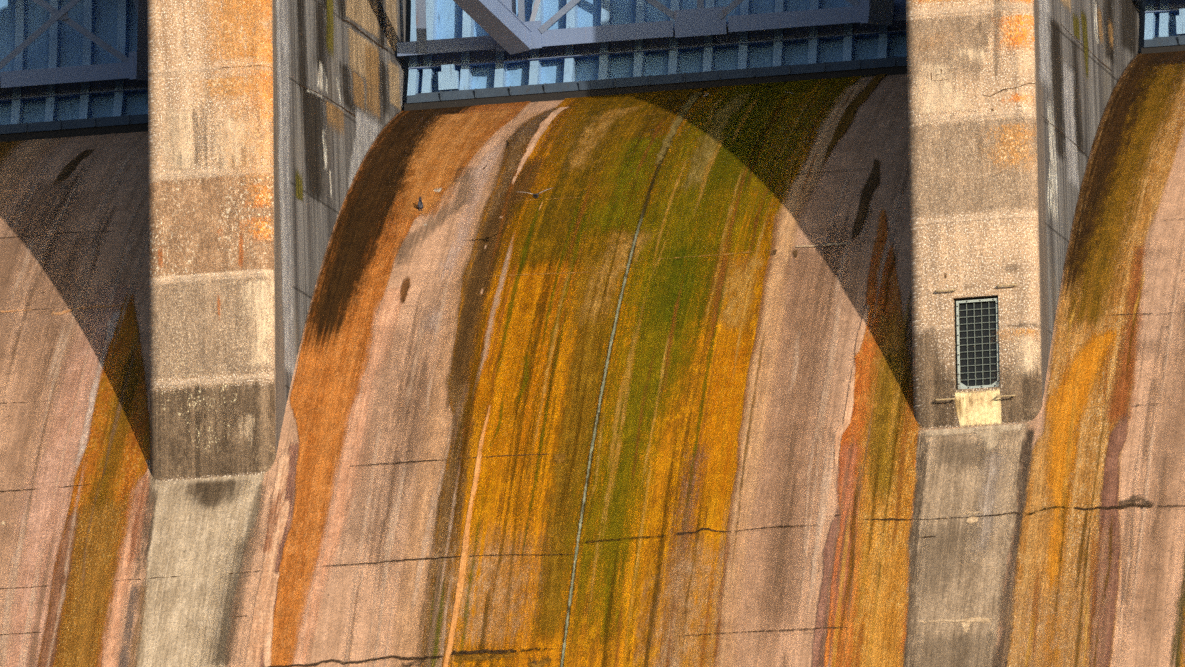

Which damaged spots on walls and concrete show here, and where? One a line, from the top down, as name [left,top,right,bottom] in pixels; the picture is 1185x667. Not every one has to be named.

water stain [959,48,984,61]
water stain [917,63,967,123]
water stain [569,107,638,170]
water stain [685,93,751,189]
water stain [851,159,880,238]
water stain [580,233,644,319]
water stain [713,84,869,667]
water stain [102,444,298,667]
crack [326,525,807,566]
crack [836,494,1184,538]
crack [268,648,548,667]